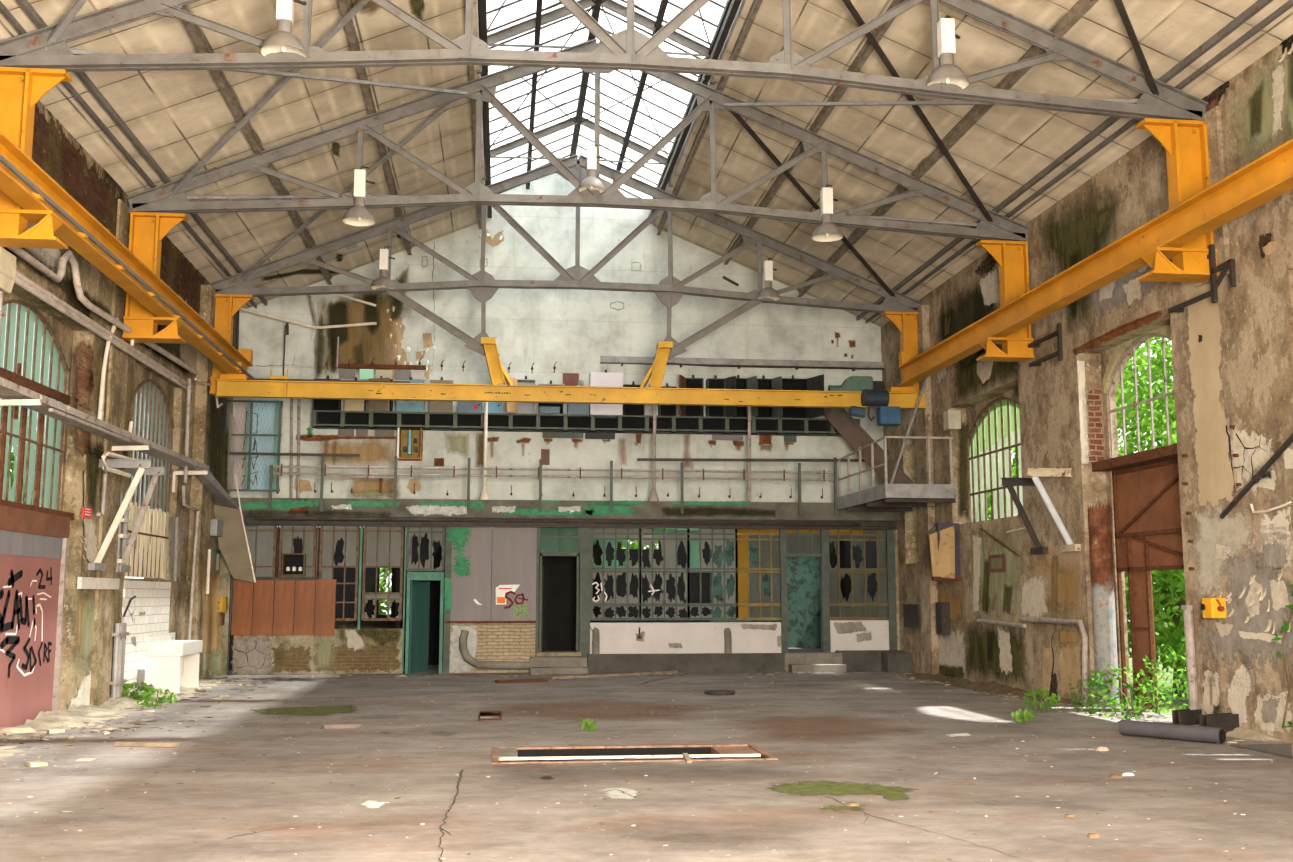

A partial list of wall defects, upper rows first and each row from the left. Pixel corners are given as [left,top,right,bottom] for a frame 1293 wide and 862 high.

water stain [1250,86,1262,136]
crack [1226,423,1274,493]
peeling [1192,448,1293,736]
spalling [272,640,401,674]